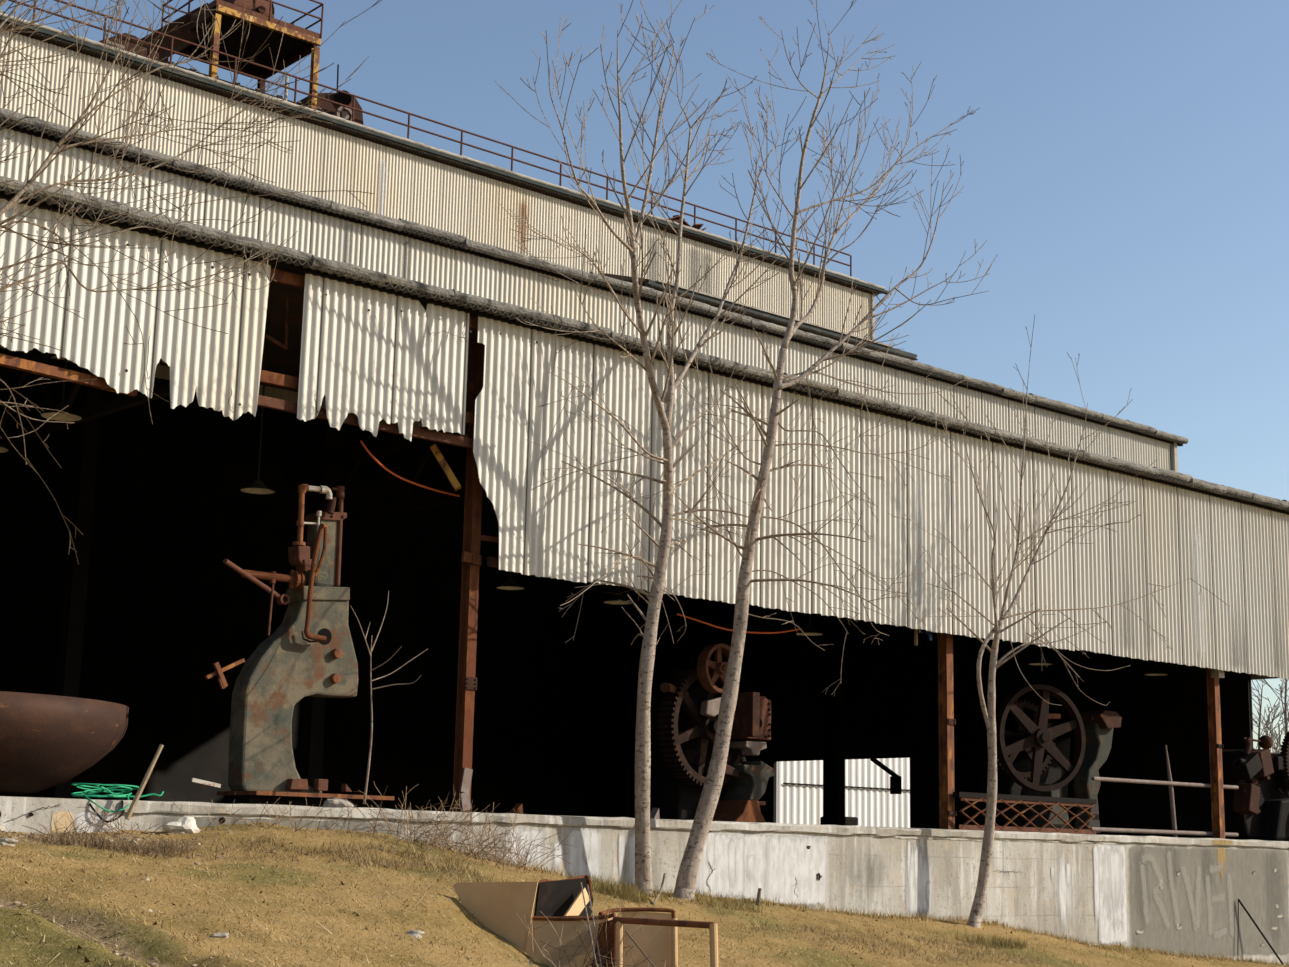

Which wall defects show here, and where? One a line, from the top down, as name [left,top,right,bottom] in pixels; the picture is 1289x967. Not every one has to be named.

damp [1195,542,1204,654]